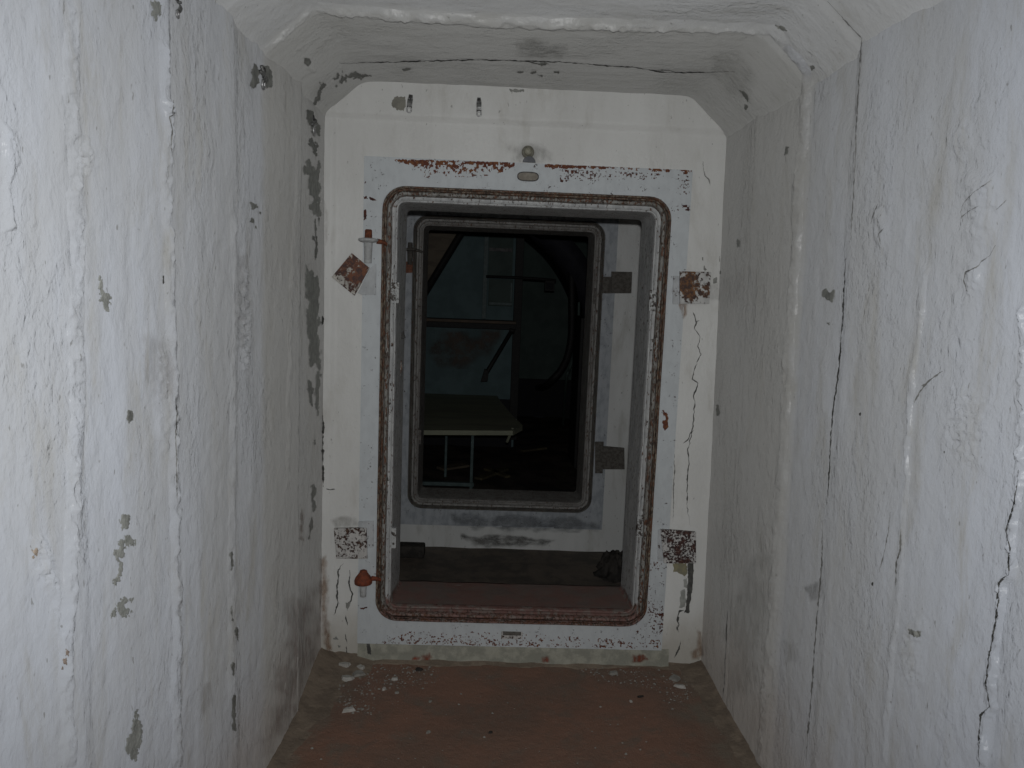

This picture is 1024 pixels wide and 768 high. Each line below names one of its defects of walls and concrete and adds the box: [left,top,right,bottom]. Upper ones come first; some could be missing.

peeling [250,63,273,89]
rust [395,159,515,178]
rust [545,164,692,211]
peeling [303,70,372,416]
peeling [98,275,112,312]
crack [806,1,862,756]
crack [673,311,701,524]
peeling [112,514,136,586]
peeling [110,596,134,618]
rust [384,586,664,662]
crack [978,470,1019,765]
peeling [125,709,143,762]